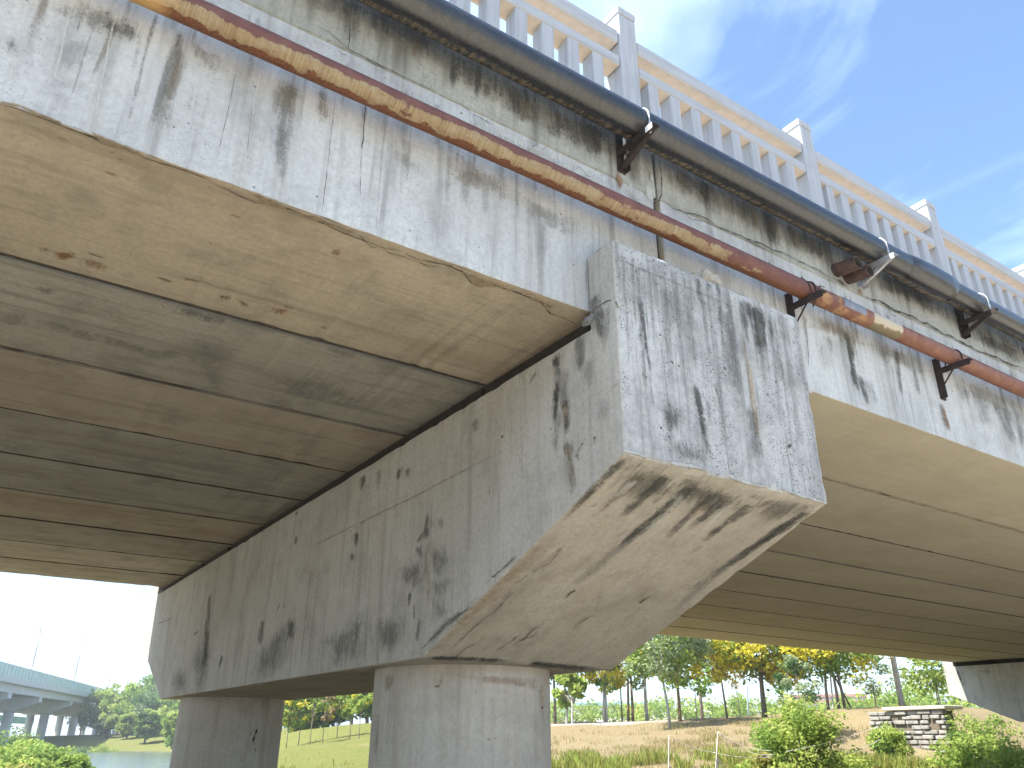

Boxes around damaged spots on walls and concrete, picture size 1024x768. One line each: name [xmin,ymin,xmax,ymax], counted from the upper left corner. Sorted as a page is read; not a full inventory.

peeling [485,122,601,181]
spalling [1,101,577,325]
crack [633,160,829,277]
leakage [553,355,569,430]
leakage [639,301,651,369]
leakage [694,387,709,450]
leakage [743,304,767,434]
leakage [824,321,869,402]
crack [868,297,1021,368]
leakage [573,460,624,512]
leakage [621,484,749,544]
leakage [718,513,809,574]